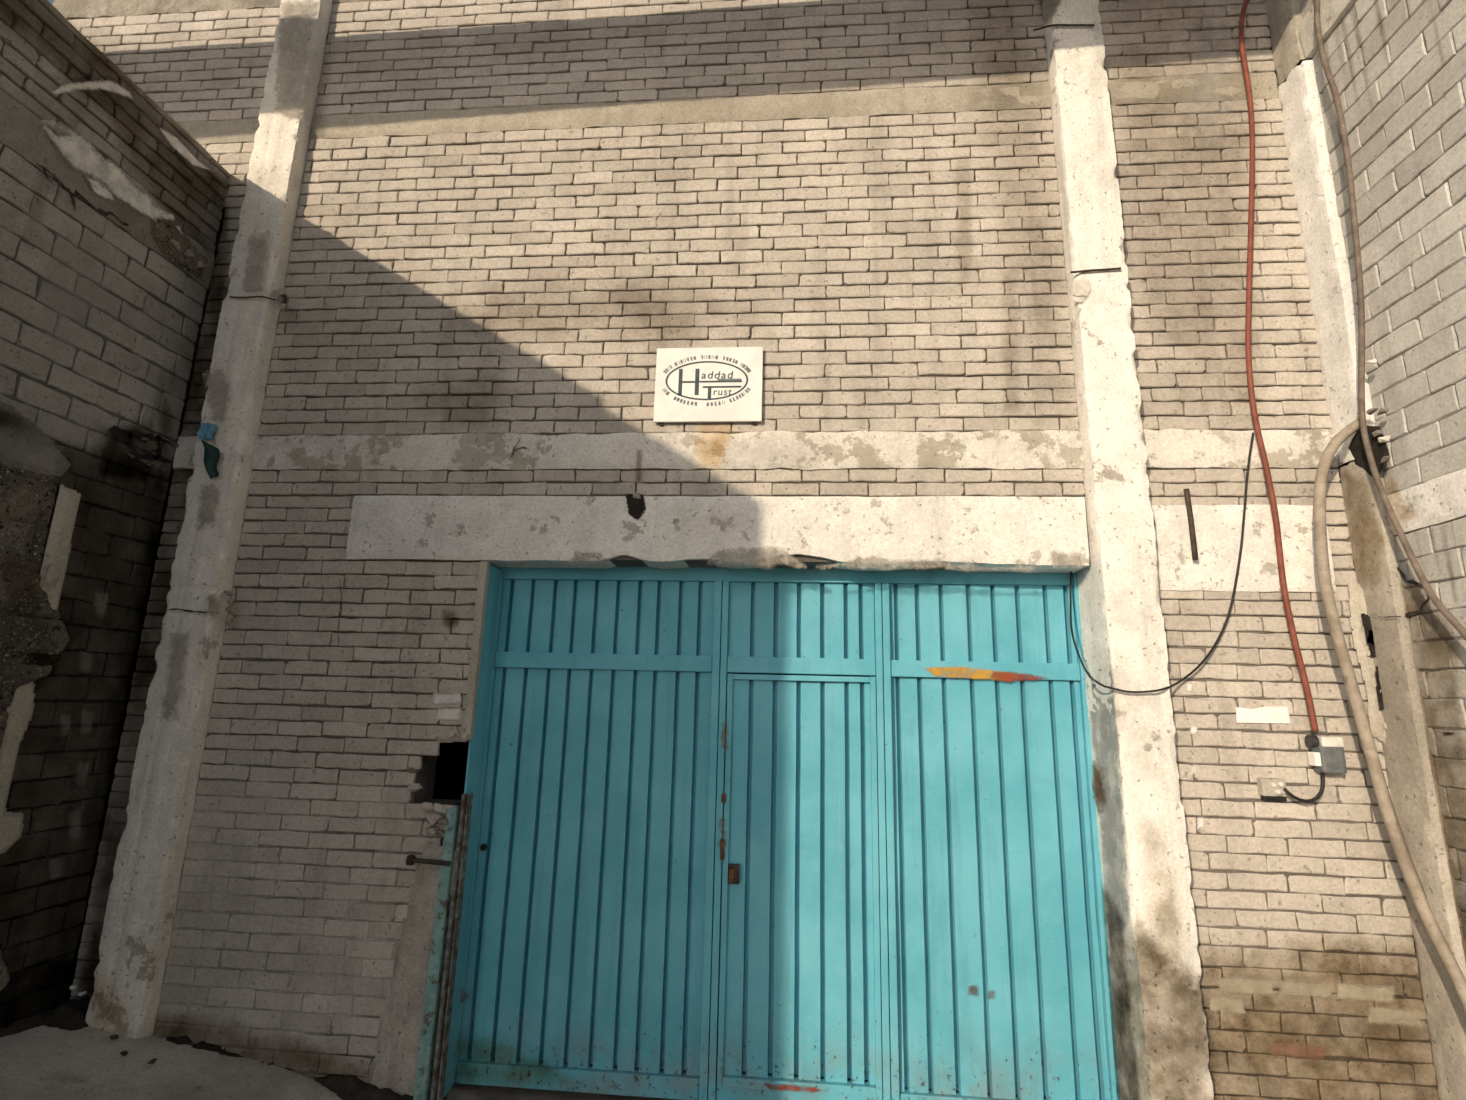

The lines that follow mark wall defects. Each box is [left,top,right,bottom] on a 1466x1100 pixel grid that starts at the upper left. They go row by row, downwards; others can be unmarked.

peeling [42,120,208,280]
spalling [626,475,646,519]
spalling [0,402,81,854]
spalling [406,767,457,838]
spalling [0,950,10,991]
damp [1103,893,1138,1100]
damp [1347,985,1424,1079]
damp [1455,902,1466,959]